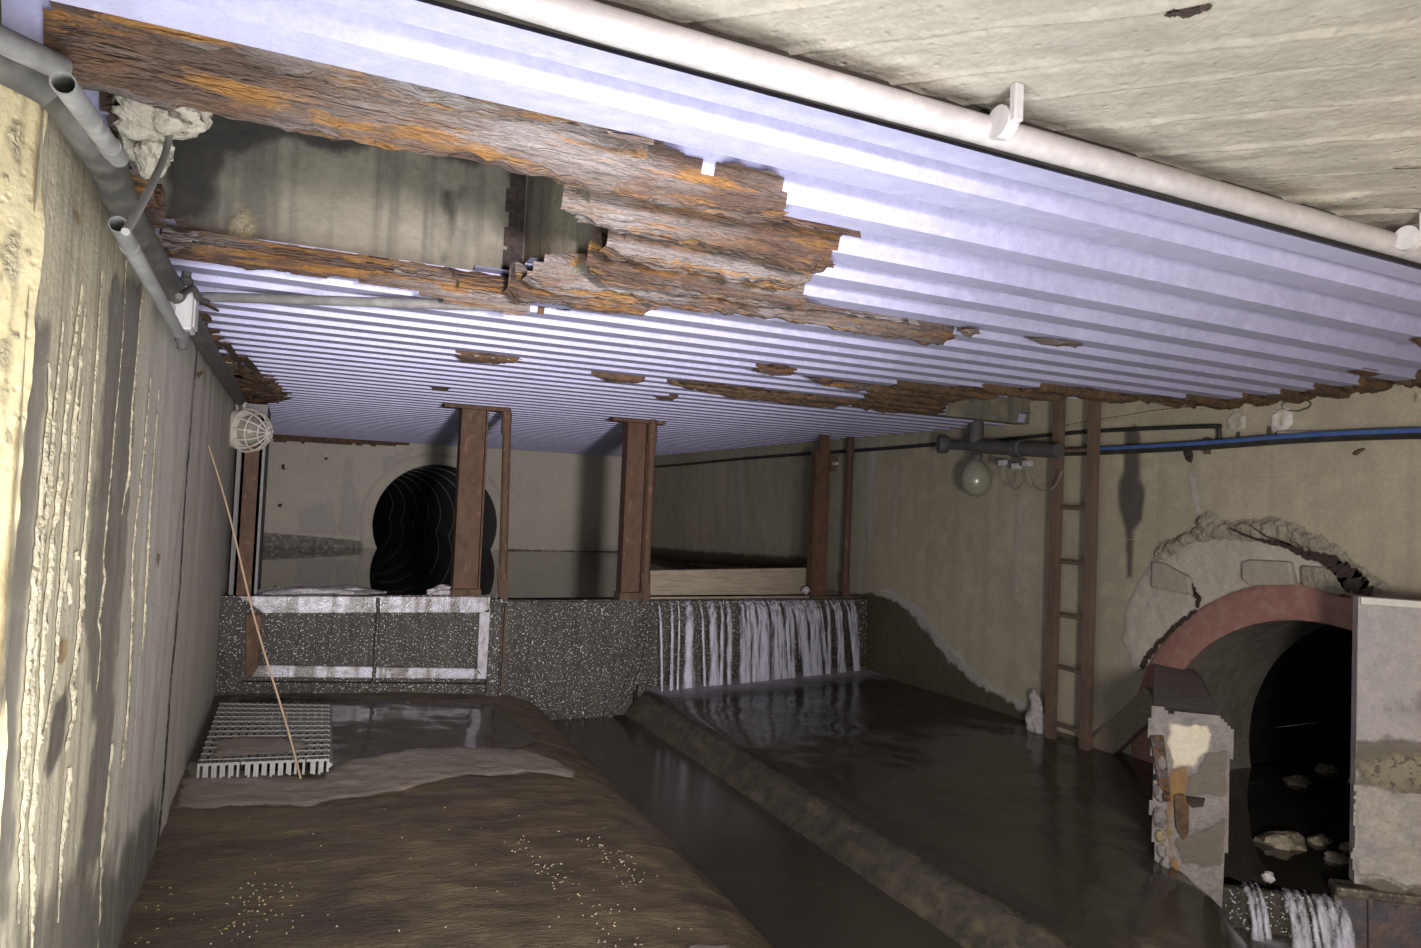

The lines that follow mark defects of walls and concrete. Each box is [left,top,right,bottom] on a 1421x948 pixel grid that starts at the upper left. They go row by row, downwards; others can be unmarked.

spalling [111,94,214,179]
spalling [225,213,255,239]
rust [1024,337,1084,349]
rust [591,363,1421,415]
spalling [1154,511,1390,596]
damp [0,260,160,948]